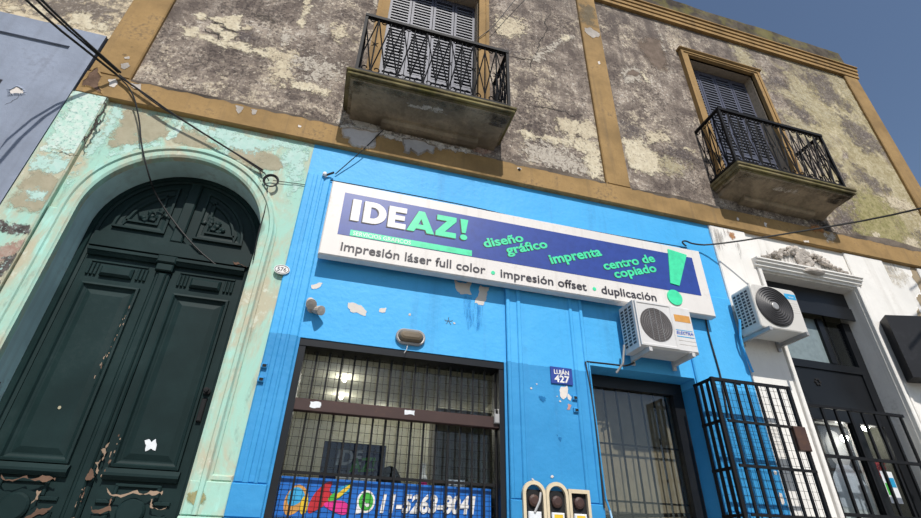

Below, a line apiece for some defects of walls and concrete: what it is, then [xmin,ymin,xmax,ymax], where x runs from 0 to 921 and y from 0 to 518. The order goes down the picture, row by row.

leakage [235,30,255,42]
peeling [6,56,309,213]
leakage [130,80,341,127]
peeling [336,112,495,156]
leakage [801,68,885,155]
leakage [497,159,605,183]
leakage [837,163,892,195]
leakage [817,191,921,252]
flaking render [0,220,31,282]
peeling [347,302,367,317]
peeling [454,280,490,306]
flaking render [909,267,921,316]